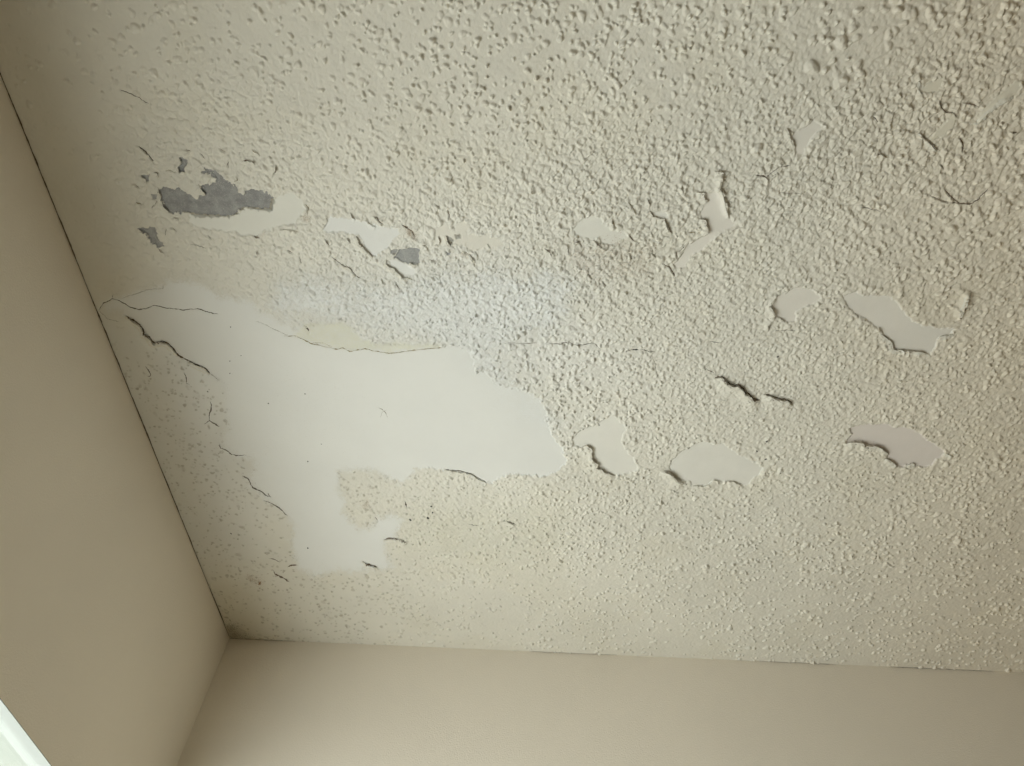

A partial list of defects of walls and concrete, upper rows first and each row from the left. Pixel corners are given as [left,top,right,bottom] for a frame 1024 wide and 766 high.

spalling [136,150,309,253]
peeling [319,212,504,288]
peeling [568,212,635,253]
peeling [664,172,748,278]
peeling [765,287,821,332]
peeling [842,291,956,357]
crack [0,73,286,641]
crack [708,370,792,406]
peeling [572,415,638,477]
peeling [661,441,763,491]
peeling [844,423,954,469]